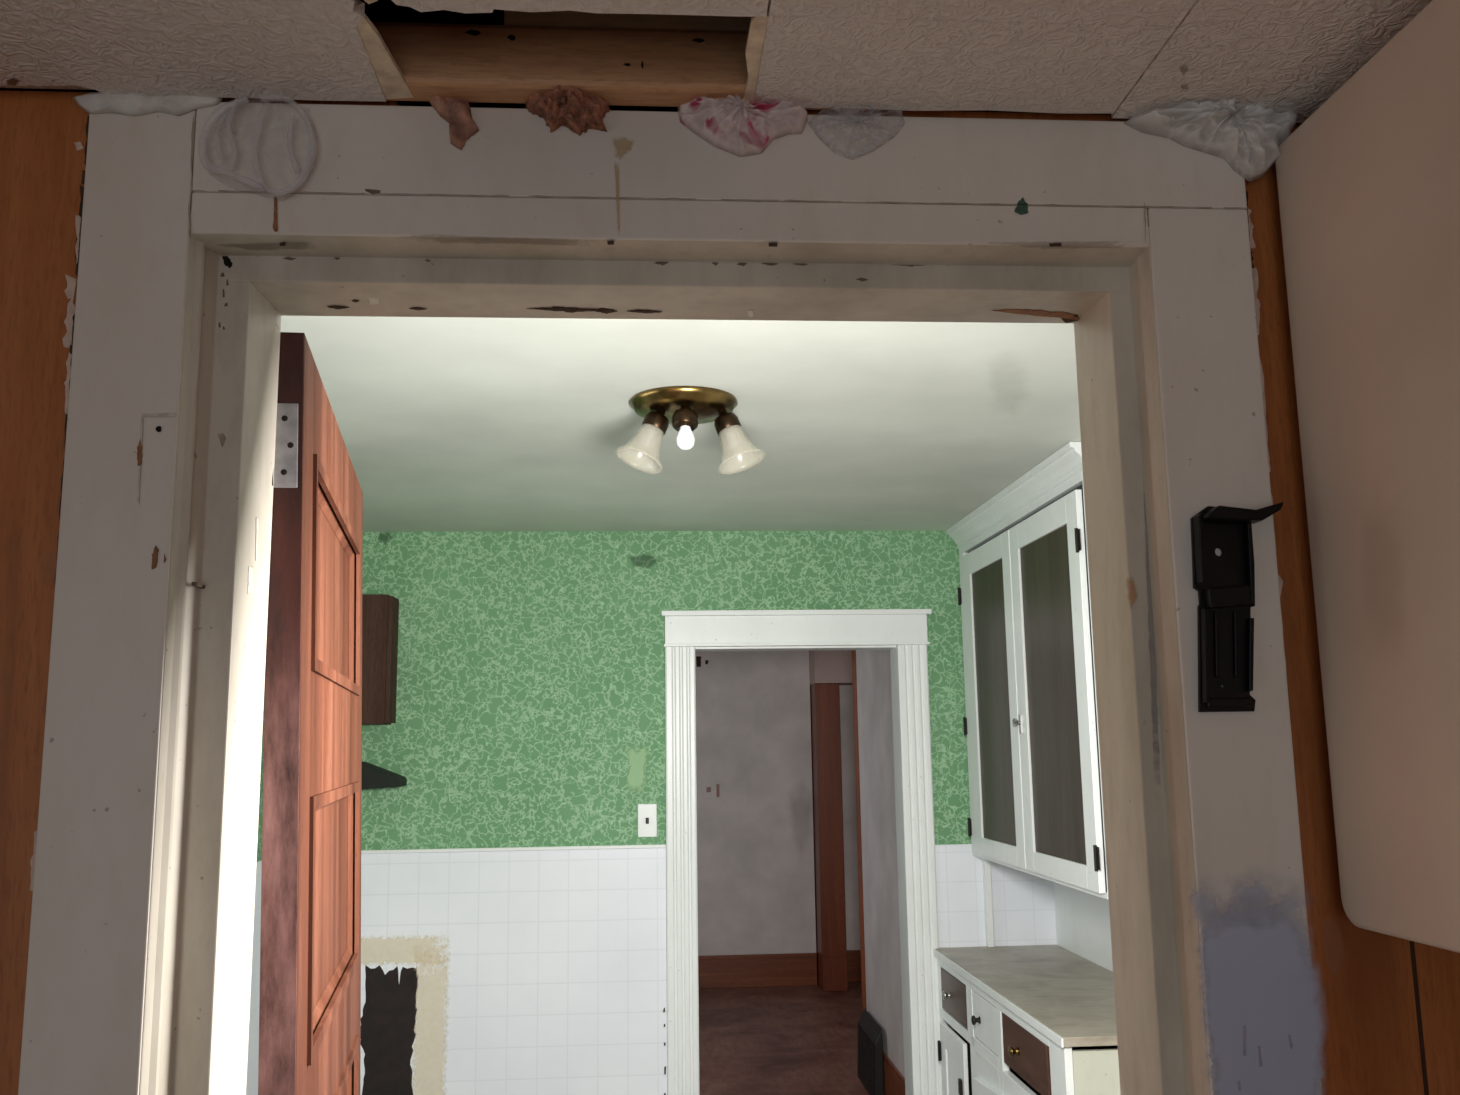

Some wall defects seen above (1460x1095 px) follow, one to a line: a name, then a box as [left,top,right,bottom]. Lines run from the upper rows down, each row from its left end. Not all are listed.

spalling [357,0,504,107]
spalling [743,11,768,101]
peeling [361,965,418,1095]
peeling [1193,887,1323,1095]